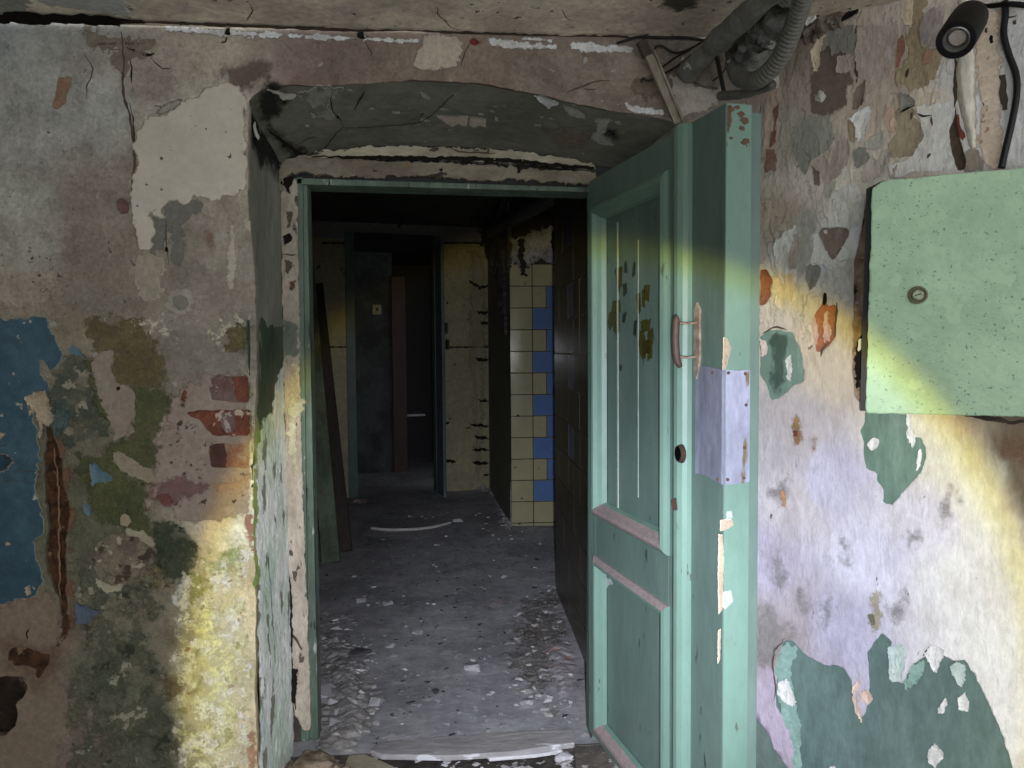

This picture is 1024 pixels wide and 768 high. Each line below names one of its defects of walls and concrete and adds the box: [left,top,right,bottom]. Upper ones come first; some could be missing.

flaking render [117,82,260,301]
crack [0,5,653,191]
peeling [759,0,1017,505]
peeling [0,316,209,768]
peeling [181,317,306,768]
peeling [756,634,1013,768]